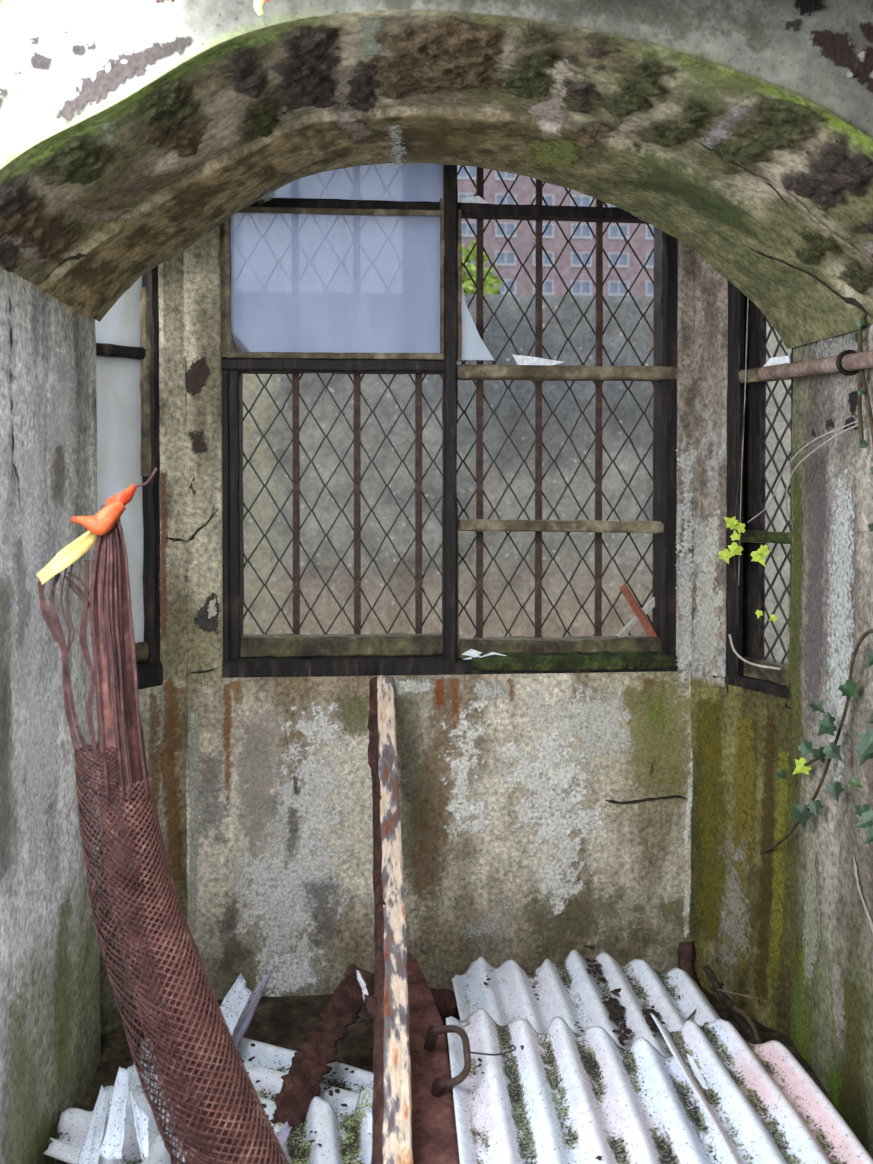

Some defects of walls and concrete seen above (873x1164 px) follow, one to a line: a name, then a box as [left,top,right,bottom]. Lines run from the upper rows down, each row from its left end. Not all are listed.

peeling [0,36,191,272]
leakage [330,0,413,165]
spalling [220,15,873,216]
leakage [524,59,574,136]
peeling [782,0,873,92]
peeling [185,355,210,396]
crack [167,499,218,542]
rust [223,679,243,799]
rust [367,688,381,799]
rust [413,679,460,901]
leakage [695,443,855,1066]
leakage [826,963,868,1149]